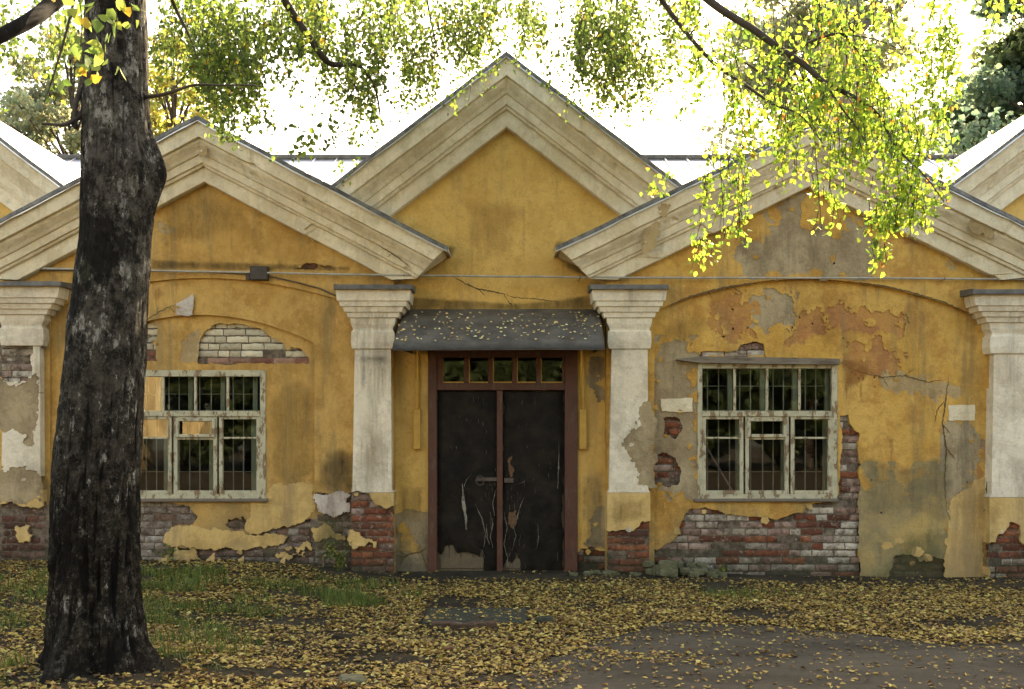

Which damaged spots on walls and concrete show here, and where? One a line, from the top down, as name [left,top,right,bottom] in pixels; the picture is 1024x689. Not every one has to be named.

peeling [0,344,47,447]
peeling [176,293,194,316]
flaking render [178,323,309,365]
crack [456,278,557,305]
flaking render [578,192,985,577]
crack [852,369,955,507]
flaking render [140,487,428,574]
flaking render [986,522,1024,578]